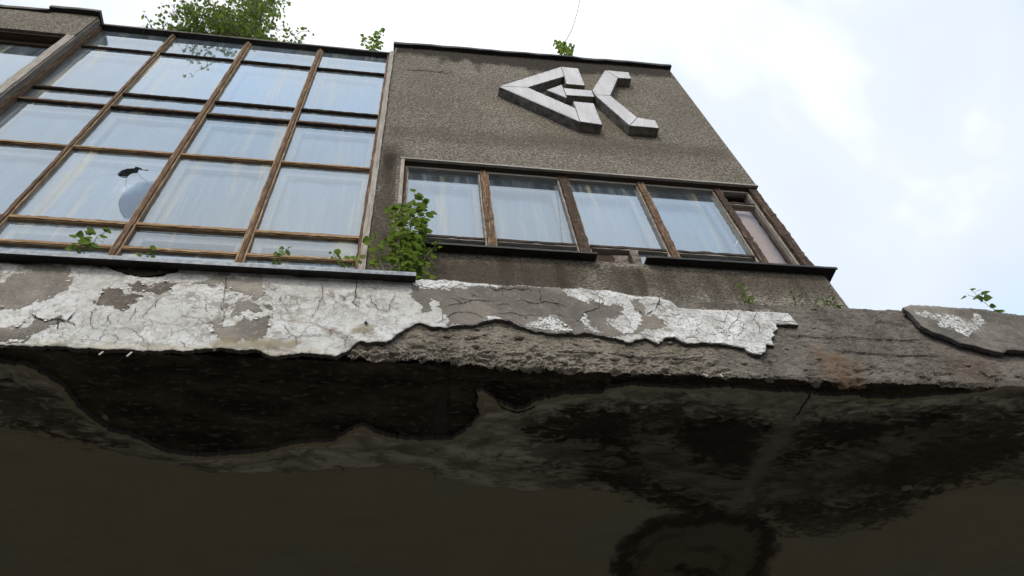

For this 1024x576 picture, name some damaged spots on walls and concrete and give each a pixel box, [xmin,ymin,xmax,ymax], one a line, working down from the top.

crack [31,286,238,347]
crack [258,279,404,353]
crack [436,285,603,323]
crack [556,311,946,361]
damp [0,379,129,449]
peeling [0,263,1024,506]
damp [521,404,1024,576]